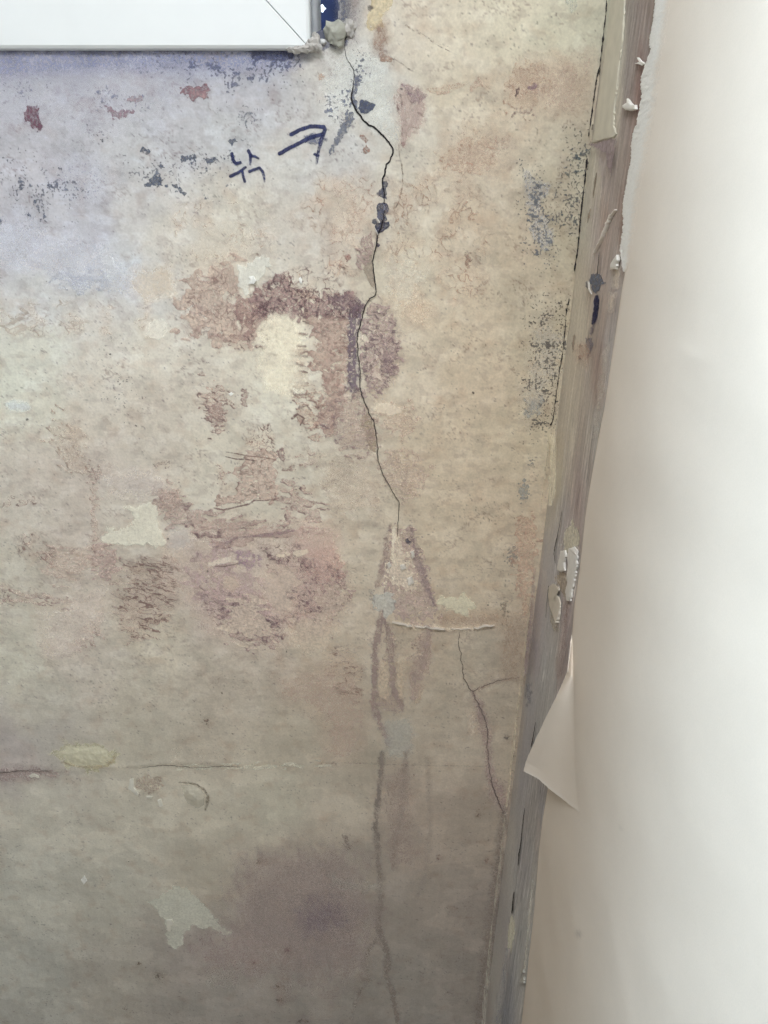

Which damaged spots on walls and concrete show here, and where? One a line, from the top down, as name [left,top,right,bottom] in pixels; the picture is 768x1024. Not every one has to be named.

water stain [133,230,430,490]
crack [345,51,403,537]
flaking render [548,546,579,623]
water stain [369,611,430,878]
crack [458,632,525,864]